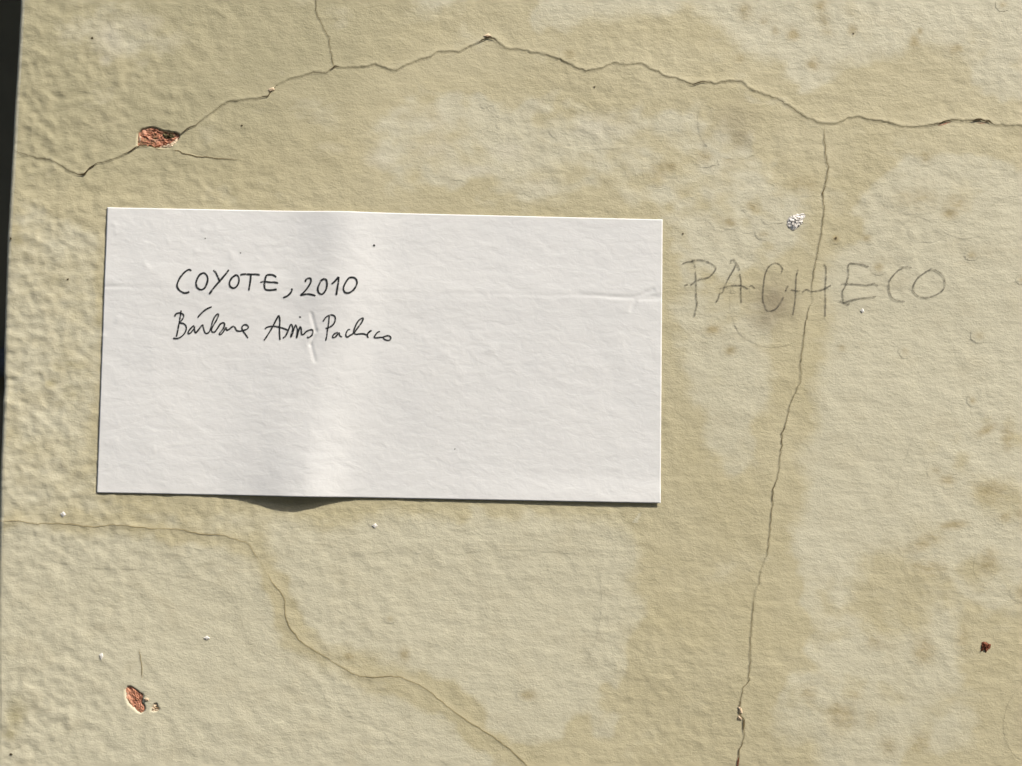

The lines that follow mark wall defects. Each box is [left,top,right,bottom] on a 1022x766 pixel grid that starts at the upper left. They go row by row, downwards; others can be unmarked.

spalling [138,128,179,148]
crack [13,9,742,175]
water stain [13,0,1022,282]
water stain [1,154,1022,766]
crack [737,95,1022,766]
spalling [126,687,160,713]
crack [10,520,527,766]